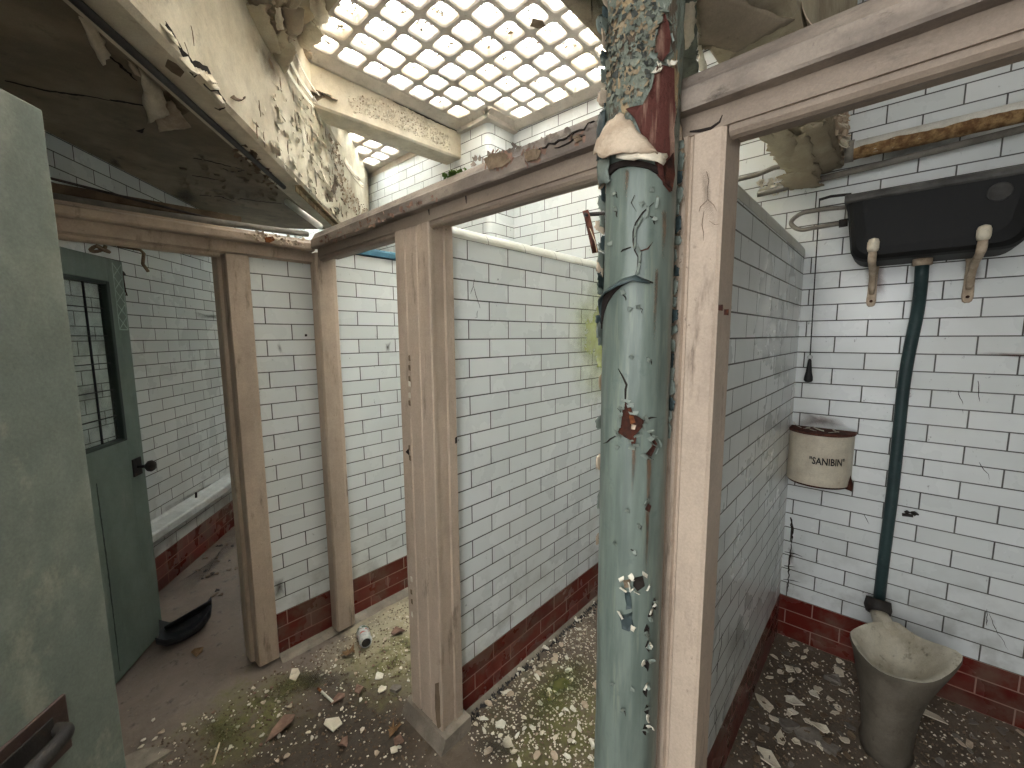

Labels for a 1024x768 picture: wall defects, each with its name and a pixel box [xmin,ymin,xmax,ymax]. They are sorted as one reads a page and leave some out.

crack [5,57,143,106]
peeling [78,16,111,66]
peeling [126,59,191,133]
peeling [160,21,246,105]
flaking render [232,0,438,244]
spalling [482,145,546,171]
flaking render [756,112,851,196]
crack [621,195,659,275]
peeling [569,0,814,476]
crack [783,517,802,592]
spalling [617,571,659,735]